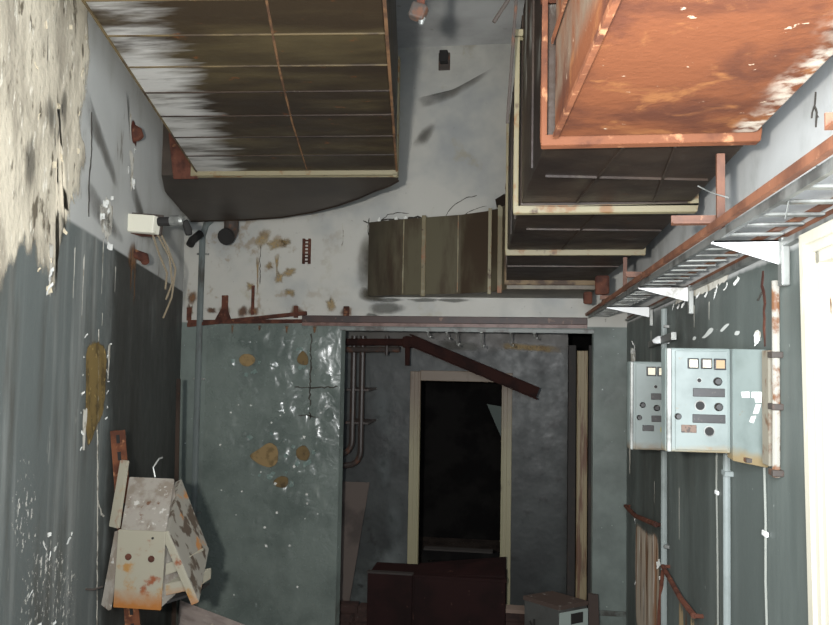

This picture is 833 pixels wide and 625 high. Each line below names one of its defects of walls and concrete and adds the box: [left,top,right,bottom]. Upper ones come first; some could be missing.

peeling [0,0,90,296]
leakage [248,232,294,289]